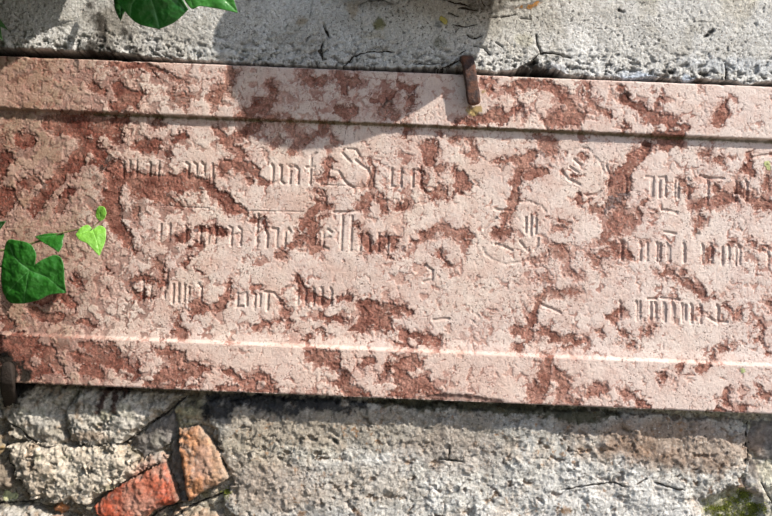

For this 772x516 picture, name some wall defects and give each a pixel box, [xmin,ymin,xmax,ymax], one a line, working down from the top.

crack [306,25,329,61]
crack [343,51,394,70]
crack [416,0,571,74]